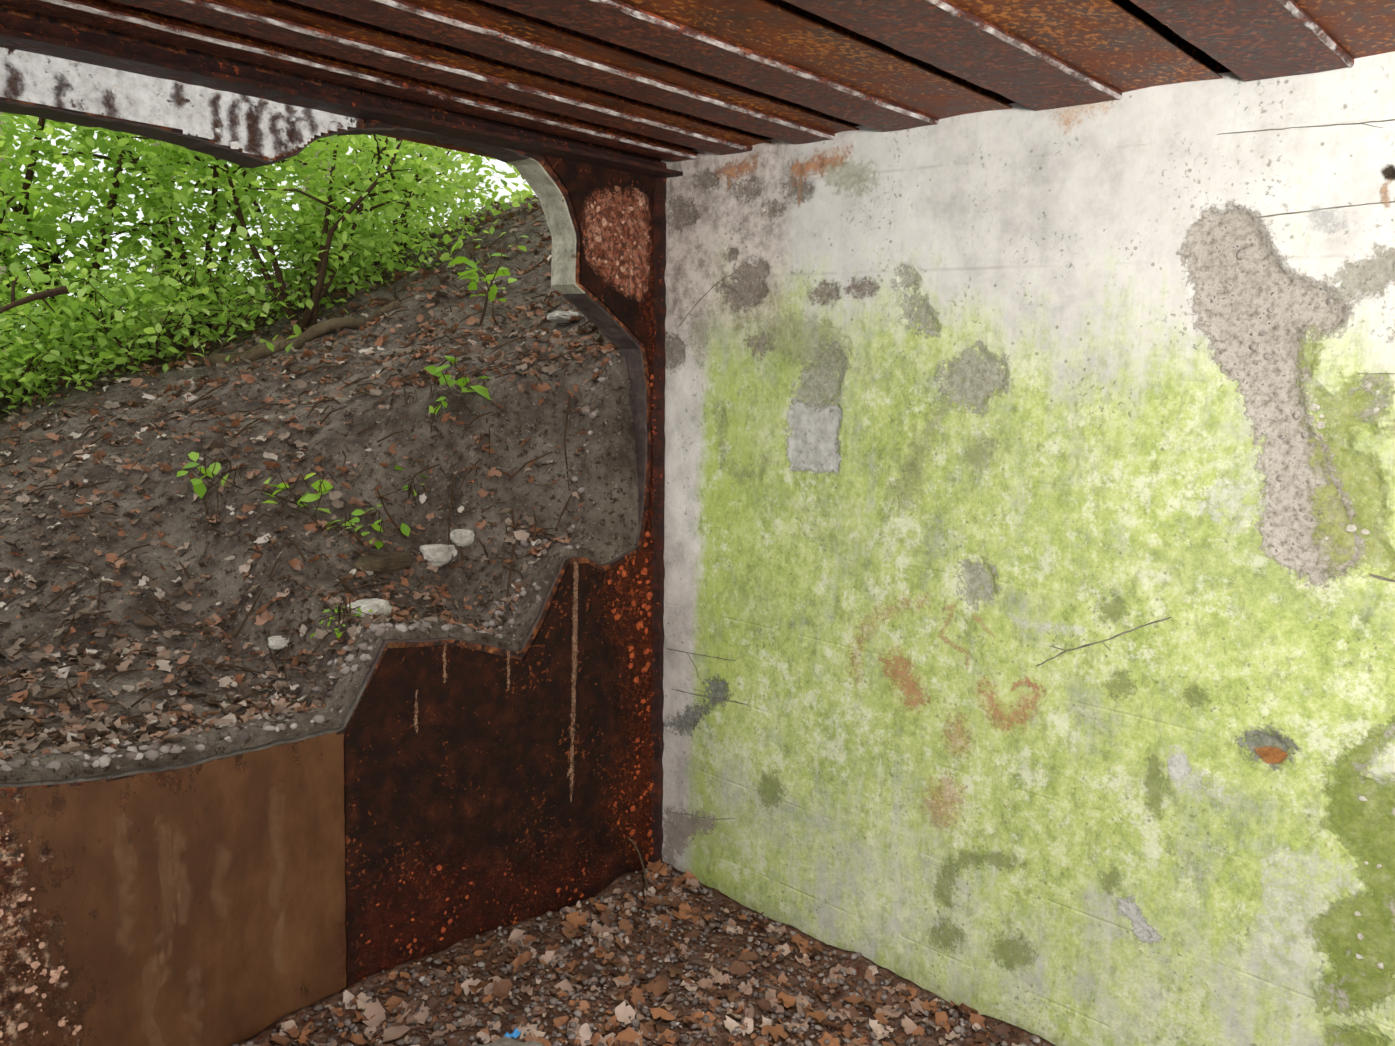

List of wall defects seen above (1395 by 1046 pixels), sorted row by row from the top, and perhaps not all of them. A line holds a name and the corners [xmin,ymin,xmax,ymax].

spalling [1180,202,1395,587]
corrosion [602,162,667,865]
damp [1100,594,1126,622]
damp [1104,671,1137,700]
damp [1183,686,1211,707]
damp [758,774,786,807]
damp [1167,753,1204,788]
corrosion [0,642,608,1046]
damp [662,808,715,863]
damp [935,852,1025,907]
damp [1117,896,1161,944]